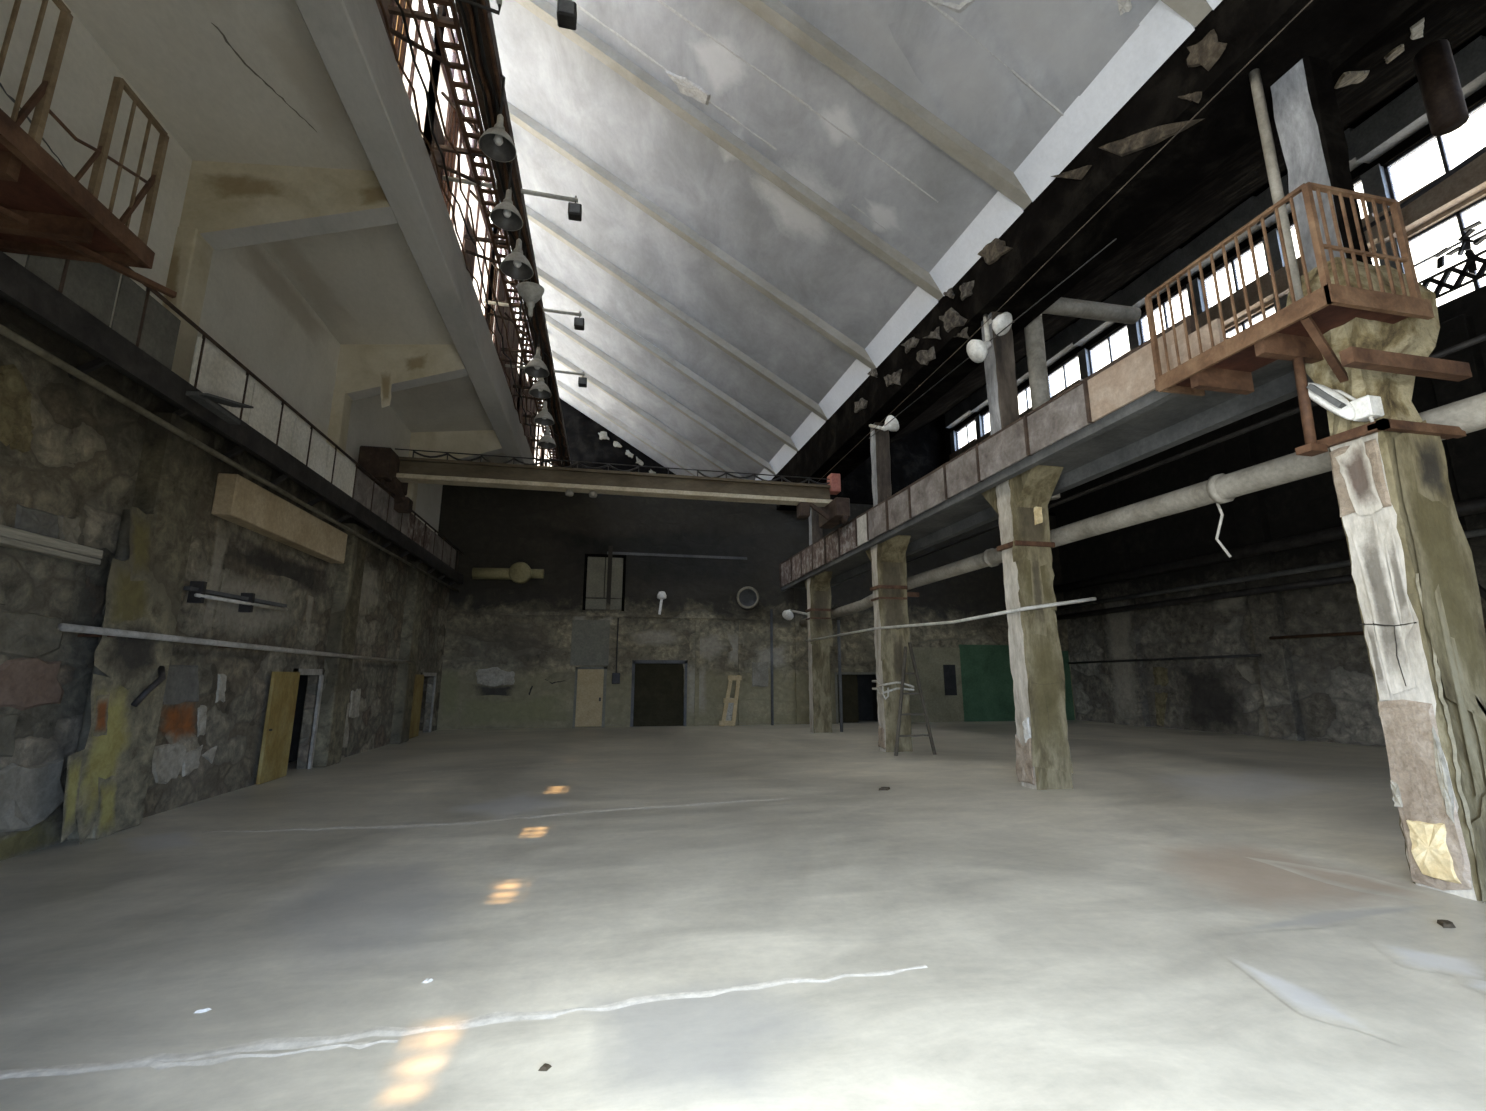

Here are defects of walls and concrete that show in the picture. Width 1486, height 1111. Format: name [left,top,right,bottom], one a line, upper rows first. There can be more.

crack [212,23,317,132]
damp [190,163,299,204]
damp [352,183,389,209]
spalling [1329,437,1392,517]
spalling [1378,700,1472,890]